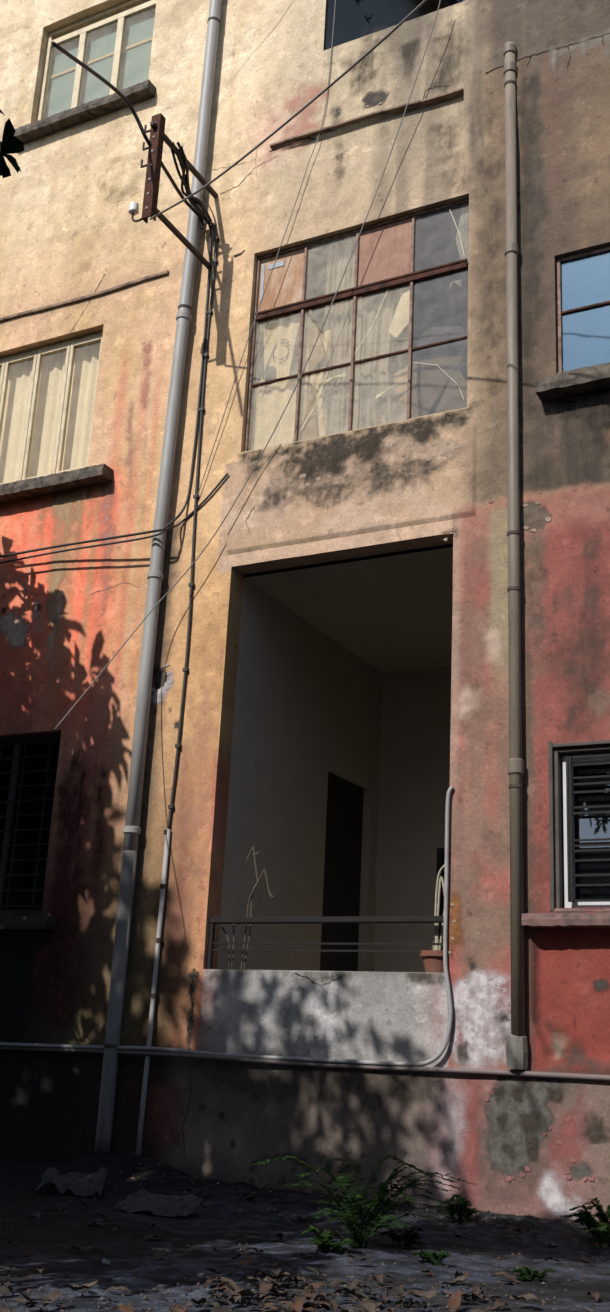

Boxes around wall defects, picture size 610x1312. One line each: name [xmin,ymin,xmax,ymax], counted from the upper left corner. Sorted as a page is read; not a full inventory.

water stain [242,407,470,508]
flaking render [151,663,174,703]
crack [176,968,197,1156]
flaking render [449,971,595,1215]